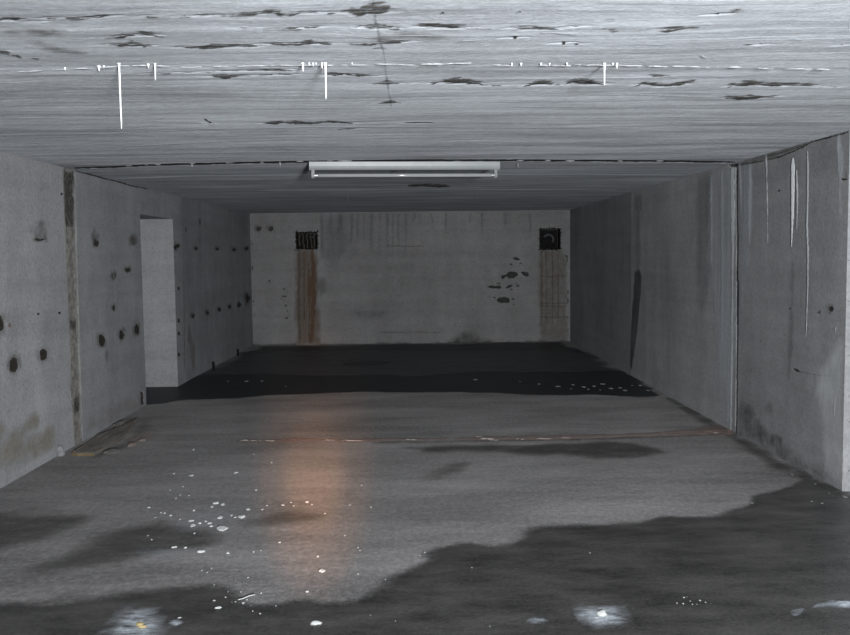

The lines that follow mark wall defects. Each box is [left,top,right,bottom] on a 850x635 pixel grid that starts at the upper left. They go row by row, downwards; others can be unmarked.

spalling [328,1,401,30]
spalling [431,77,501,86]
spalling [637,74,696,87]
spalling [727,80,819,100]
rust [296,250,319,344]
water stain [146,272,658,405]
spalling [487,257,529,305]
water stain [684,167,789,469]
water stain [791,151,809,328]
water stain [0,472,850,635]